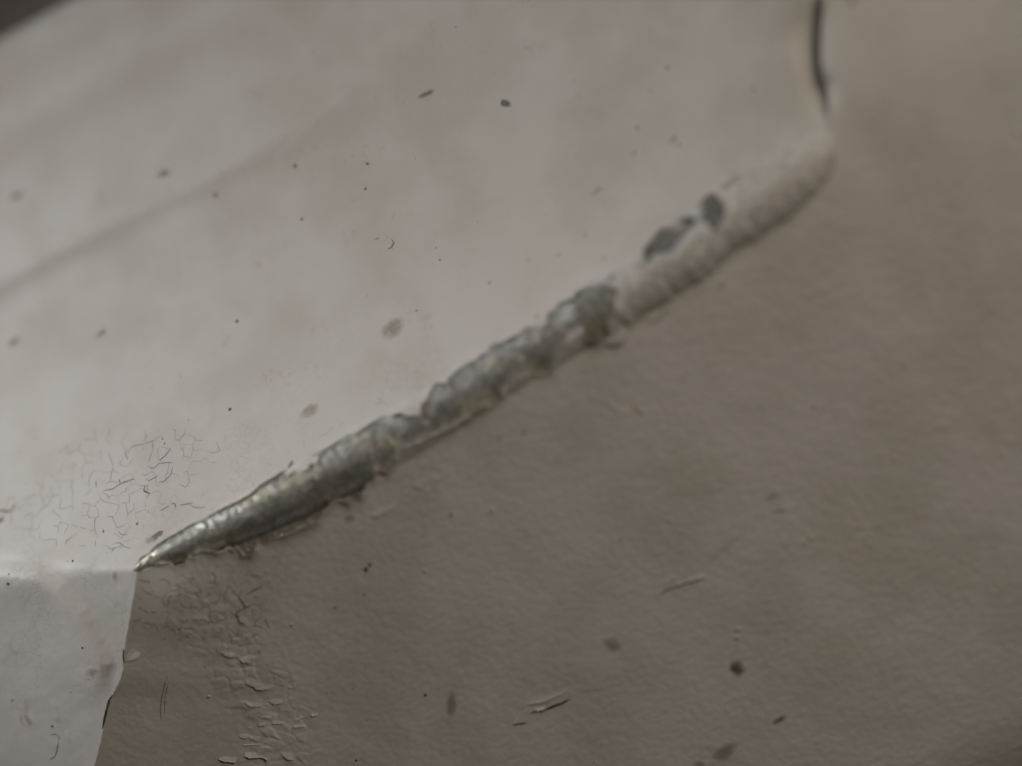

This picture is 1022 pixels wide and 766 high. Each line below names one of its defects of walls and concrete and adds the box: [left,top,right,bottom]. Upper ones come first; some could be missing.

crack [1,429,220,551]
peeling [219,680,318,763]